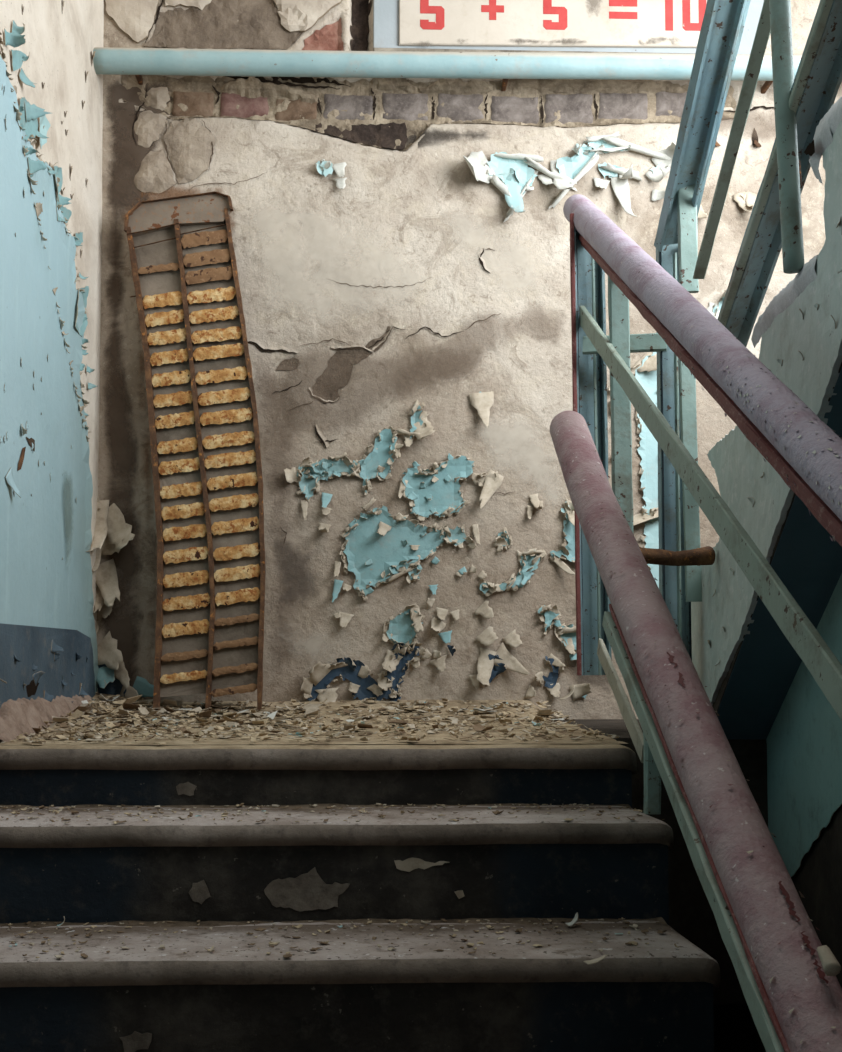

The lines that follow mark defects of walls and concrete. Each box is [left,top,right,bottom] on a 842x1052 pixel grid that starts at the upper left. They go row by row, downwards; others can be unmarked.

spalling [105,0,343,51]
spalling [122,75,689,223]
peeling [0,5,97,442]
peeling [5,424,52,498]
damp [102,83,173,687]
spalling [308,326,393,403]
peeling [469,391,494,428]
peeling [0,497,154,742]
peeling [284,400,504,702]
peeling [456,498,592,700]
peeling [264,867,350,912]
peeling [394,858,449,872]